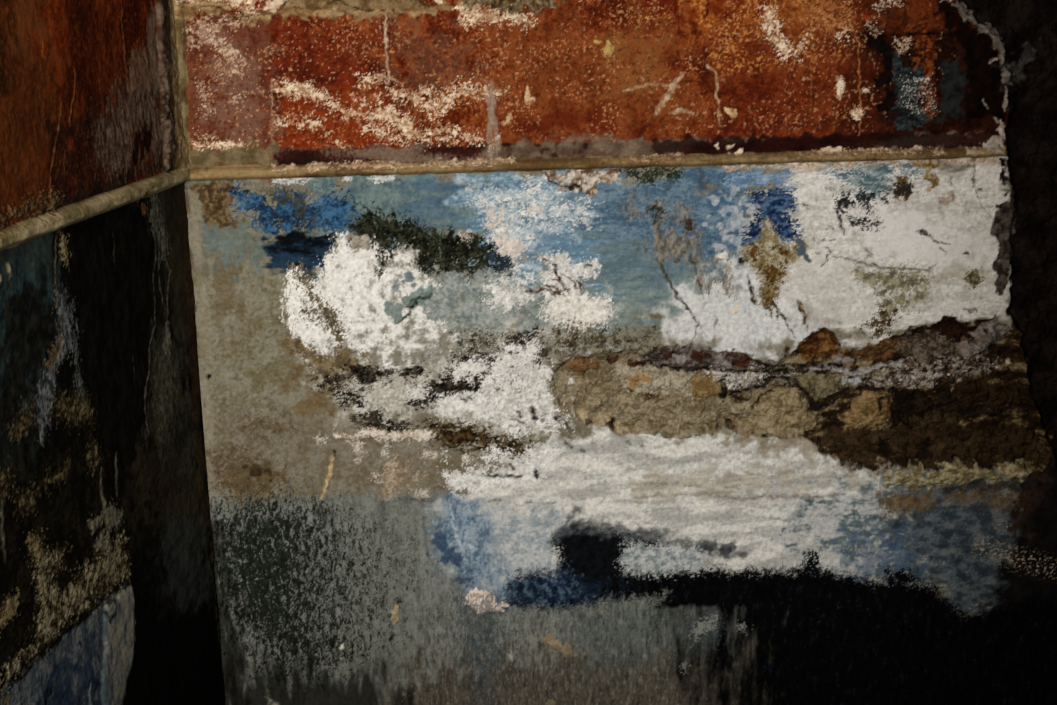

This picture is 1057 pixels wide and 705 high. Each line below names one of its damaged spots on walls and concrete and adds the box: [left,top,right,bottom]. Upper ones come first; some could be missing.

peeling [84,0,607,231]
flaking render [266,0,1057,507]
crack [654,252,720,343]
damp [204,402,1057,705]